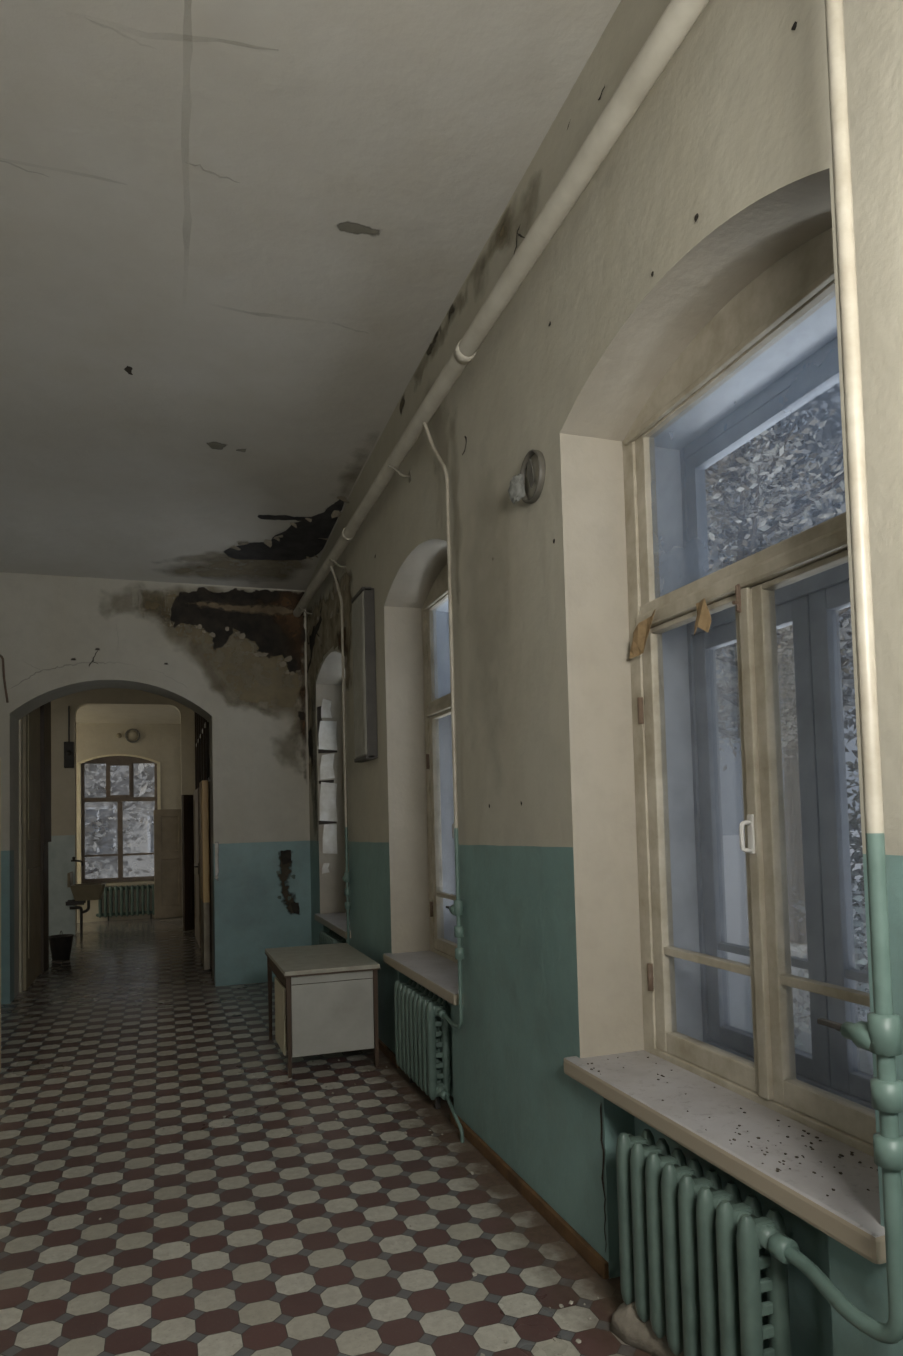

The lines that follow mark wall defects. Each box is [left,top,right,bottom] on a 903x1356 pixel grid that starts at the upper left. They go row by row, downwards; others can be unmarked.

peeling [224,496,349,560]
flaking render [170,572,352,874]